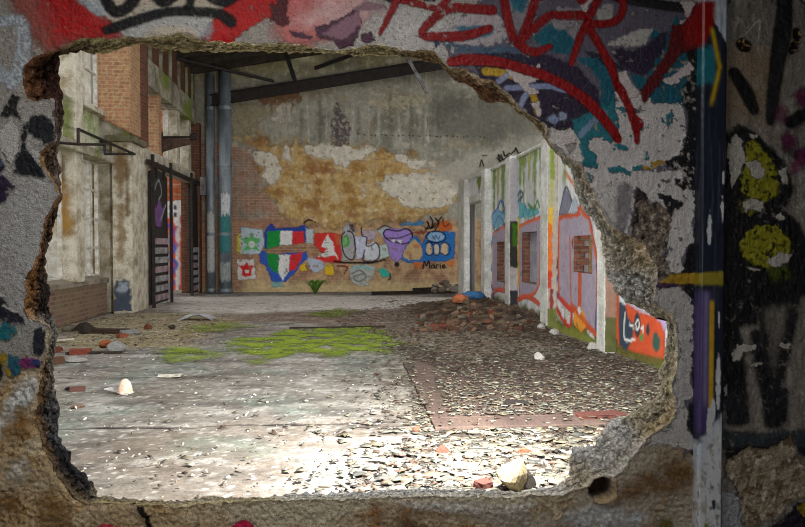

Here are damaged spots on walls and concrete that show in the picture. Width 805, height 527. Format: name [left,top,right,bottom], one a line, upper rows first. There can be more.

peeling [679,0,695,25]
spalling [0,33,695,509]
crack [137,506,152,527]
flaking render [722,435,805,527]